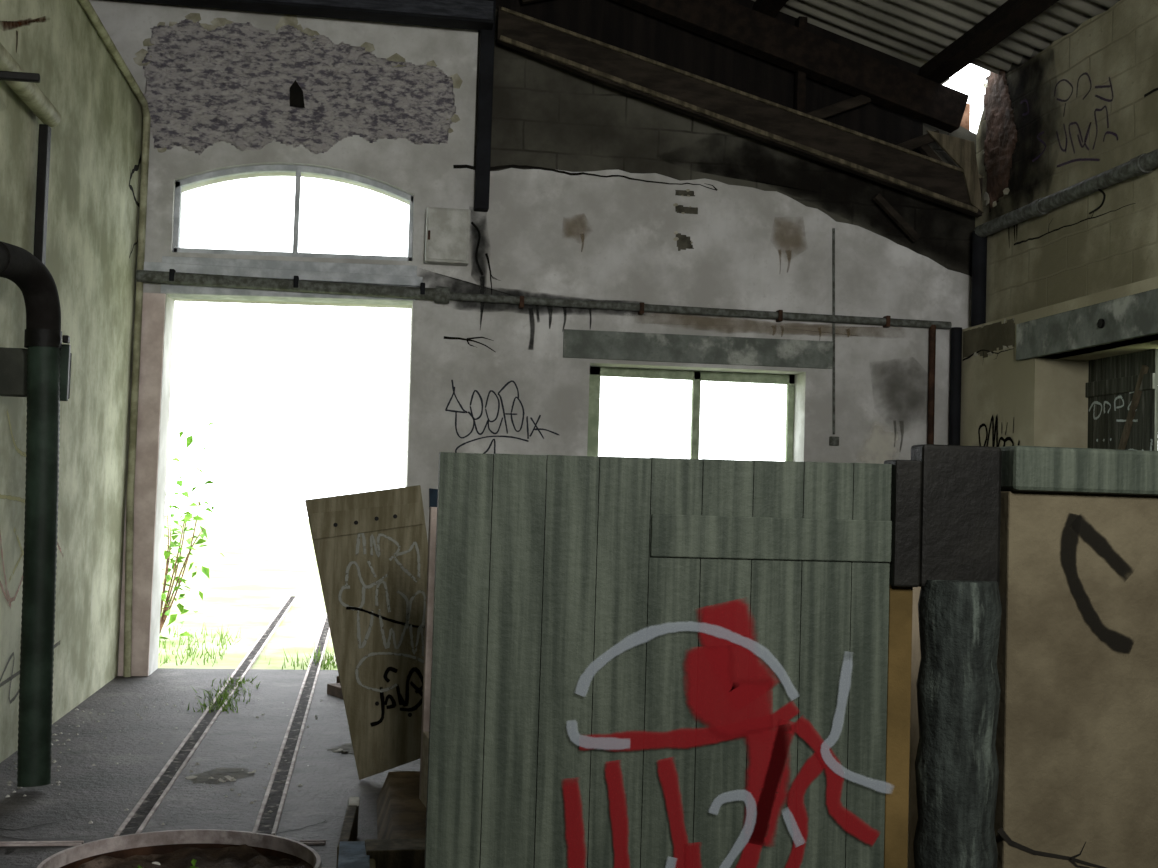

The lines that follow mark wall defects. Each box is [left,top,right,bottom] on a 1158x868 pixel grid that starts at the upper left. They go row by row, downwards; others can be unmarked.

flaking render [133,13,463,155]
flaking render [983,69,1017,208]
leakage [868,374,922,464]